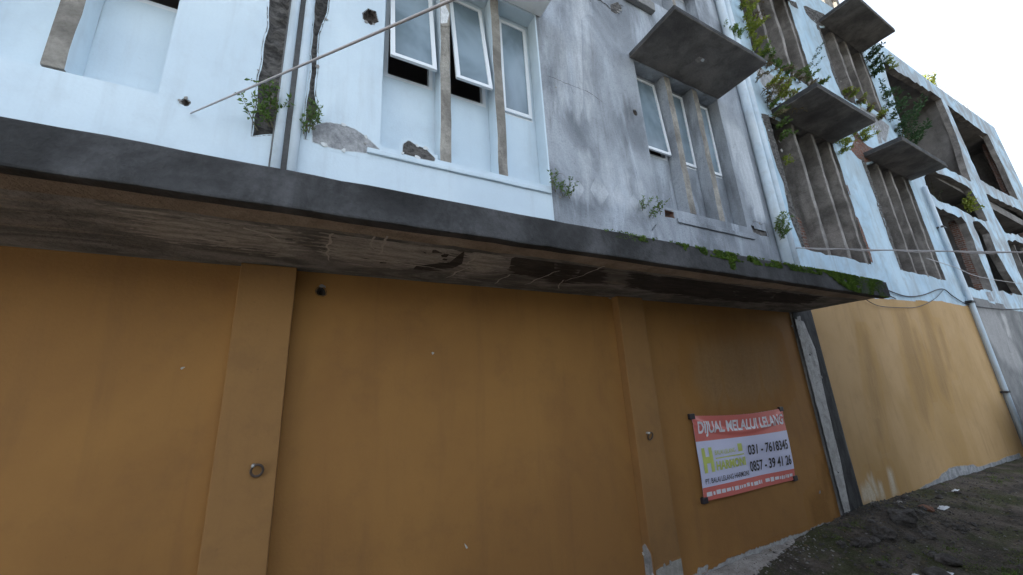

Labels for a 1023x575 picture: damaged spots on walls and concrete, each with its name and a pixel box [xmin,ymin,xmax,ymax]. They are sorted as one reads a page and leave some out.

flaking render [246,0,290,141]
peeling [300,0,387,160]
peeling [400,137,438,163]
peeling [293,228,534,284]